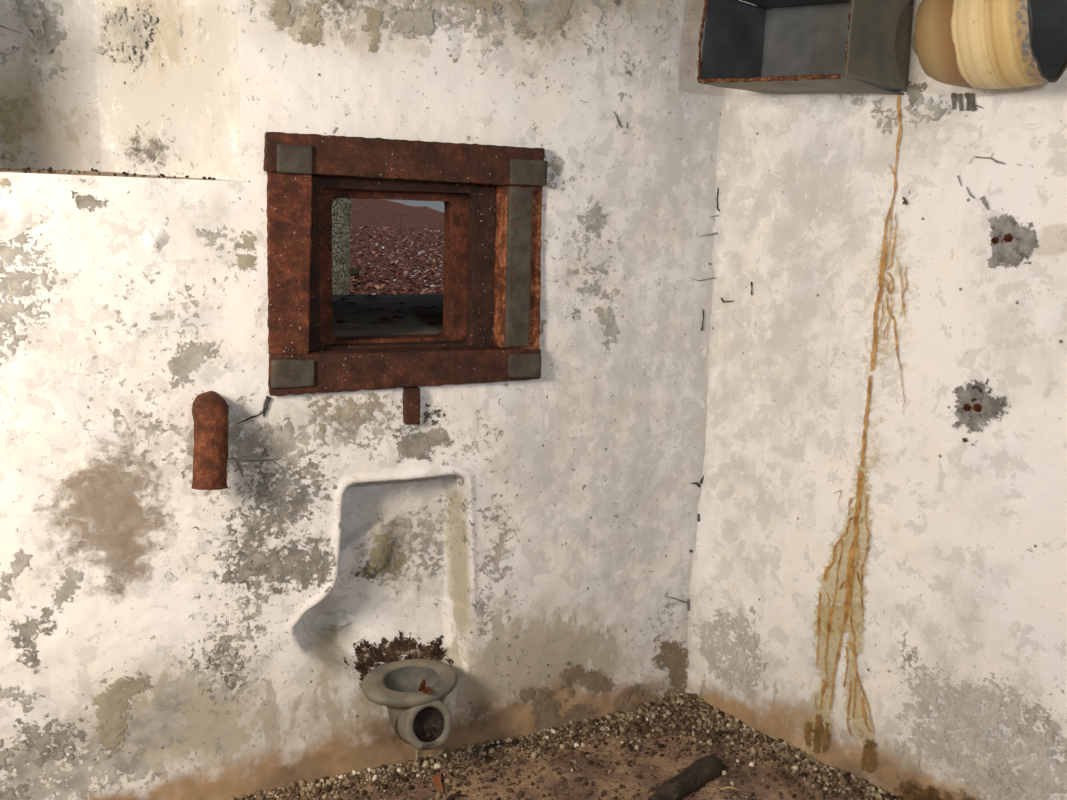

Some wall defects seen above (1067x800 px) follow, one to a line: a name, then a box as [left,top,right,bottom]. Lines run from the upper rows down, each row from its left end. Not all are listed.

peeling [71,191,108,212]
peeling [196,225,257,271]
spalling [988,214,1039,268]
peeling [0,227,67,378]
peeling [167,339,218,389]
corrosion [804,94,907,773]
spalling [951,380,1011,445]
water stain [52,449,169,595]
peeling [0,549,85,674]
water stain [512,662,644,732]
water stain [651,634,689,698]
peeling [0,671,153,800]